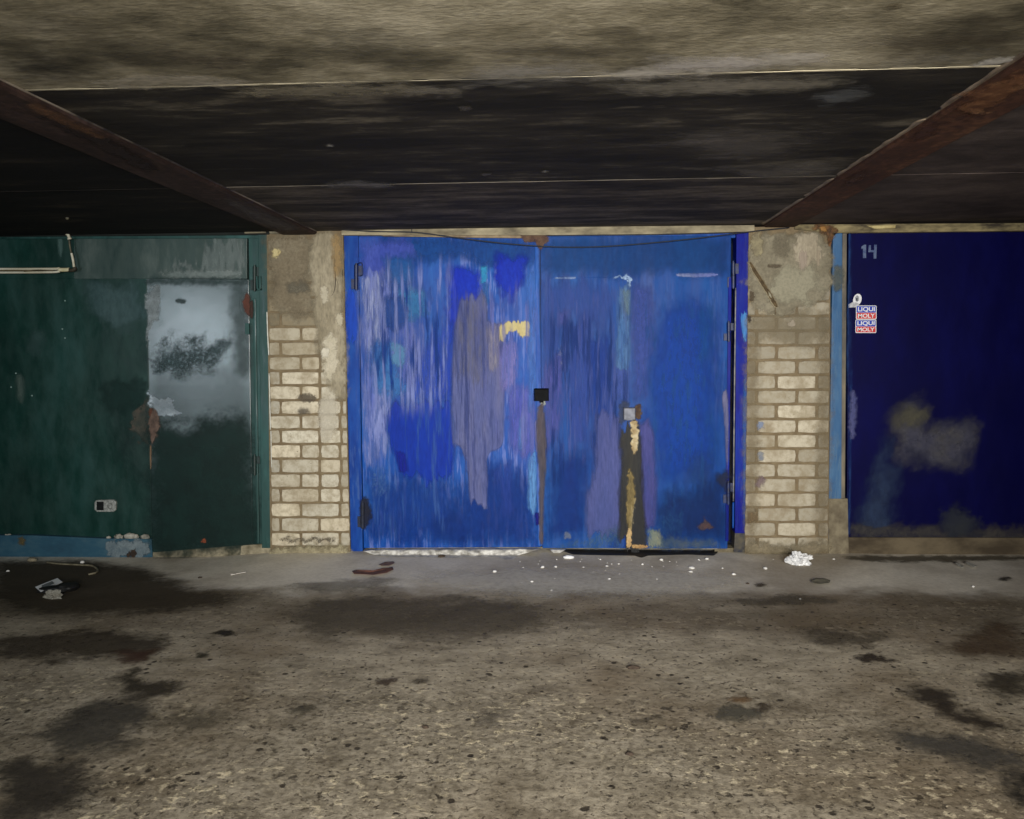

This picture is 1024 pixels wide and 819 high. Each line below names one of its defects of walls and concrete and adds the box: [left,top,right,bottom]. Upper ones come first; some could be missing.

damp [92,76,458,97]
damp [610,53,867,102]
damp [973,57,1012,66]
peeling [145,284,161,337]
spalling [321,313,343,380]
peeling [147,390,181,417]
rust [130,400,160,469]
rust [535,401,546,544]